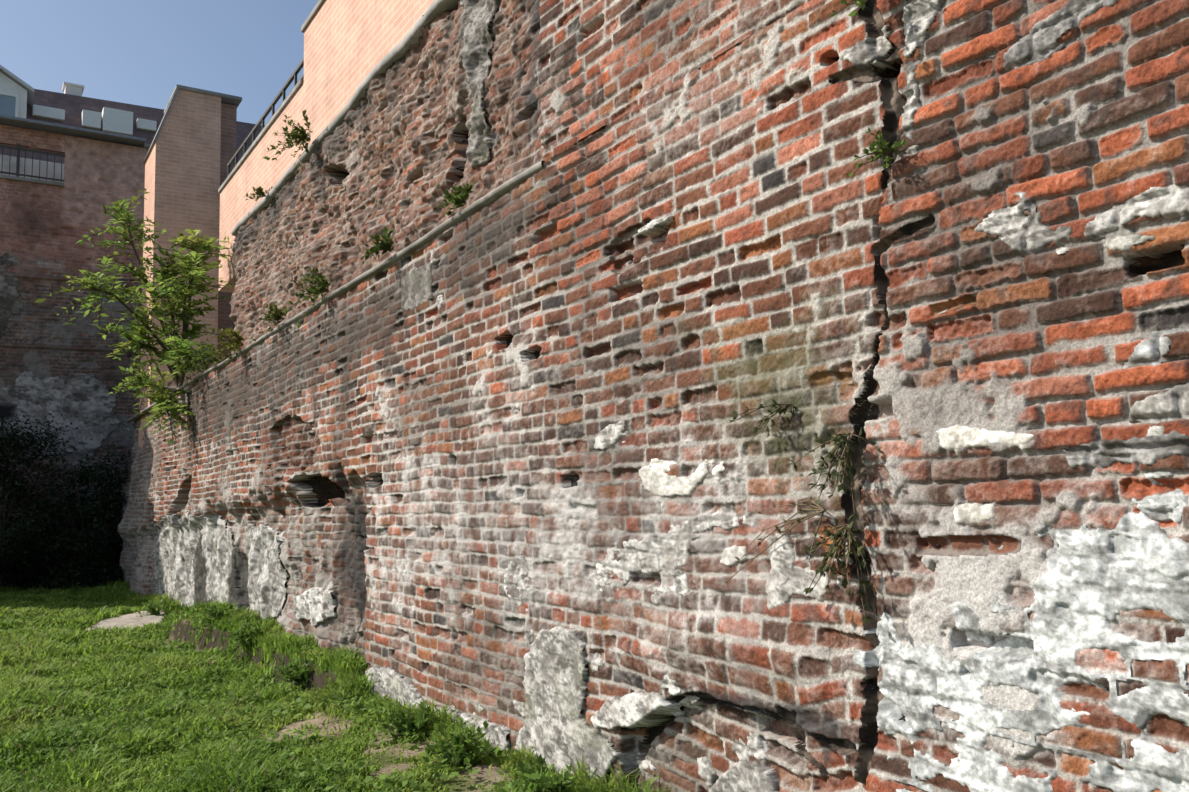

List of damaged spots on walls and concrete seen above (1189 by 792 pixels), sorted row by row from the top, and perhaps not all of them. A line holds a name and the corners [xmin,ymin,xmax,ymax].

crack [829,0,906,191]
spalling [1103,226,1185,277]
spalling [272,415,346,508]
crack [621,214,935,789]
peeling [852,471,1189,792]
peeling [583,652,605,672]
peeling [513,700,526,717]
peeling [660,674,704,709]
peeling [620,751,656,775]